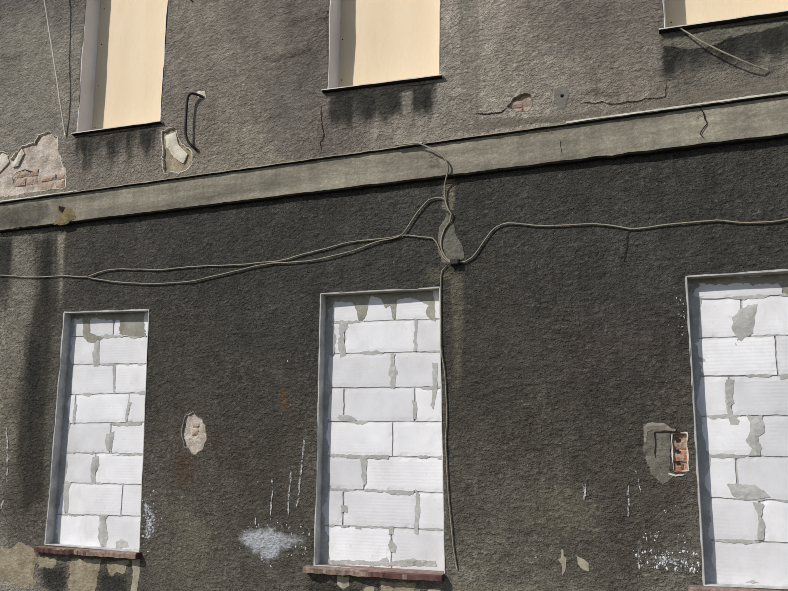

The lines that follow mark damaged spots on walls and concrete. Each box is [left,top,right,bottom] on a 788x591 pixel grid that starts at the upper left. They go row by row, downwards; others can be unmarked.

water stain [662,18,788,67]
water stain [330,82,434,131]
flaking render [457,92,597,131]
flaking render [579,76,788,105]
flaking render [0,131,67,197]
water stain [76,126,156,161]
flaking render [161,127,193,174]
water stain [0,238,11,286]
water stain [19,234,64,507]
flaking render [181,411,207,455]
flaking render [0,542,57,590]
flaking render [67,557,141,591]